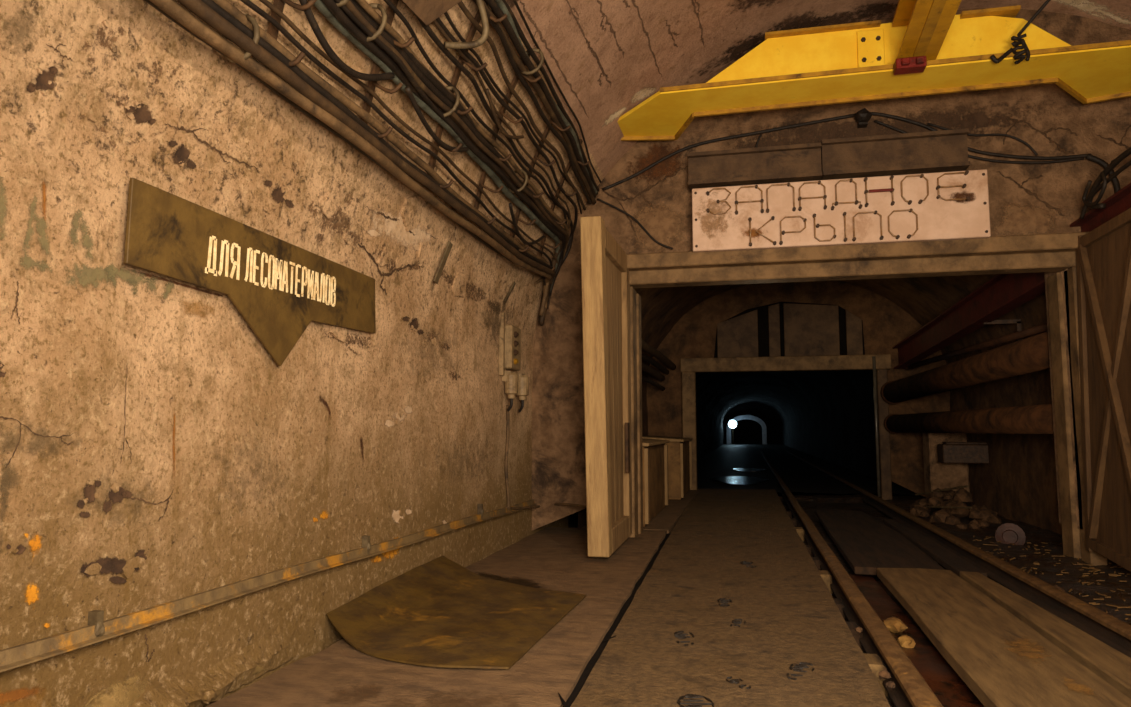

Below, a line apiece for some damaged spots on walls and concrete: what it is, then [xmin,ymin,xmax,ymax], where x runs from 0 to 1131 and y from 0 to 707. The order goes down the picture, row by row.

water stain [728,0,780,10]
water stain [770,12,822,30]
water stain [859,2,897,17]
crack [520,0,705,118]
spalling [27,66,58,95]
spalling [110,91,156,125]
spalling [169,140,196,169]
crack [165,123,257,169]
spalling [77,480,132,518]
corrosion [24,533,41,554]
spalling [80,549,147,584]
corrosion [25,585,39,605]